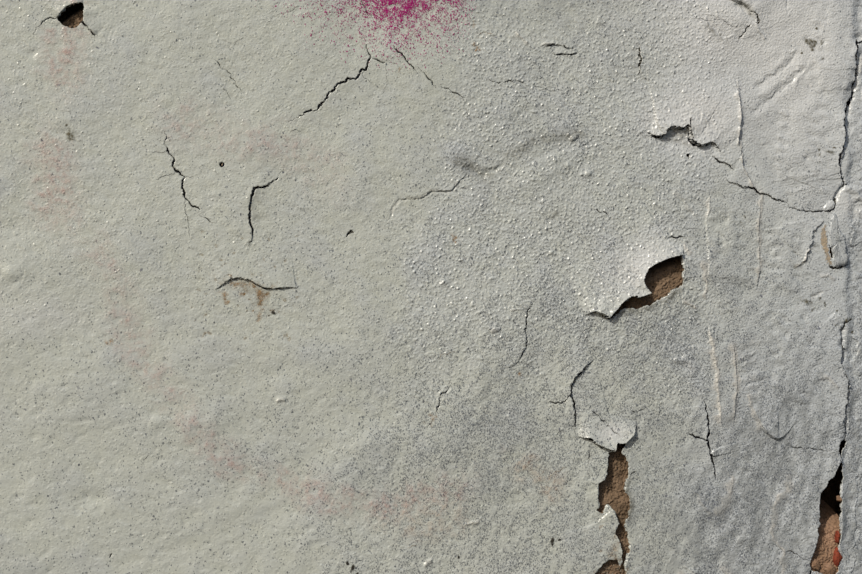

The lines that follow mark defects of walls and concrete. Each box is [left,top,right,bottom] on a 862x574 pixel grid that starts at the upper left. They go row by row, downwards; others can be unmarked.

peeling [57,3,84,28]
crack [292,44,468,132]
crack [643,41,862,212]
crack [152,133,210,237]
crack [248,169,284,246]
peeling [584,235,688,323]
crack [547,326,617,484]
crack [689,399,716,479]
peeling [579,420,635,574]
peeling [810,495,843,574]